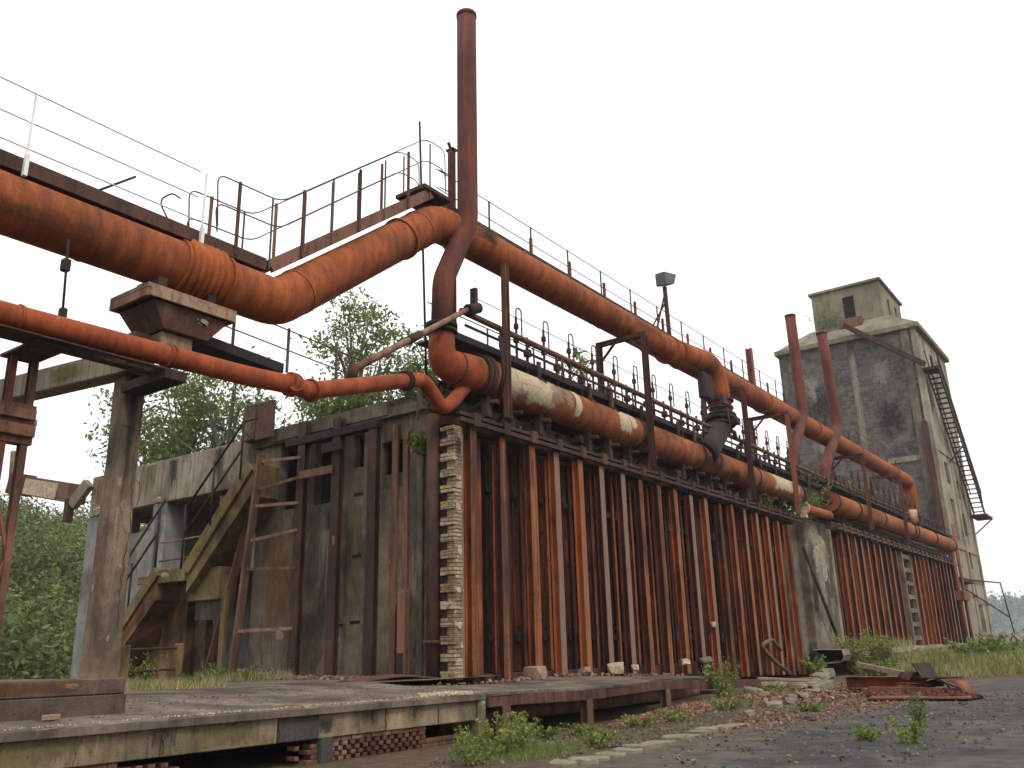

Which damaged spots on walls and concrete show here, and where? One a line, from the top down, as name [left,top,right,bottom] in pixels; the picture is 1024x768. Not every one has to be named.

peeling [502,367,583,417]
peeling [614,409,638,434]